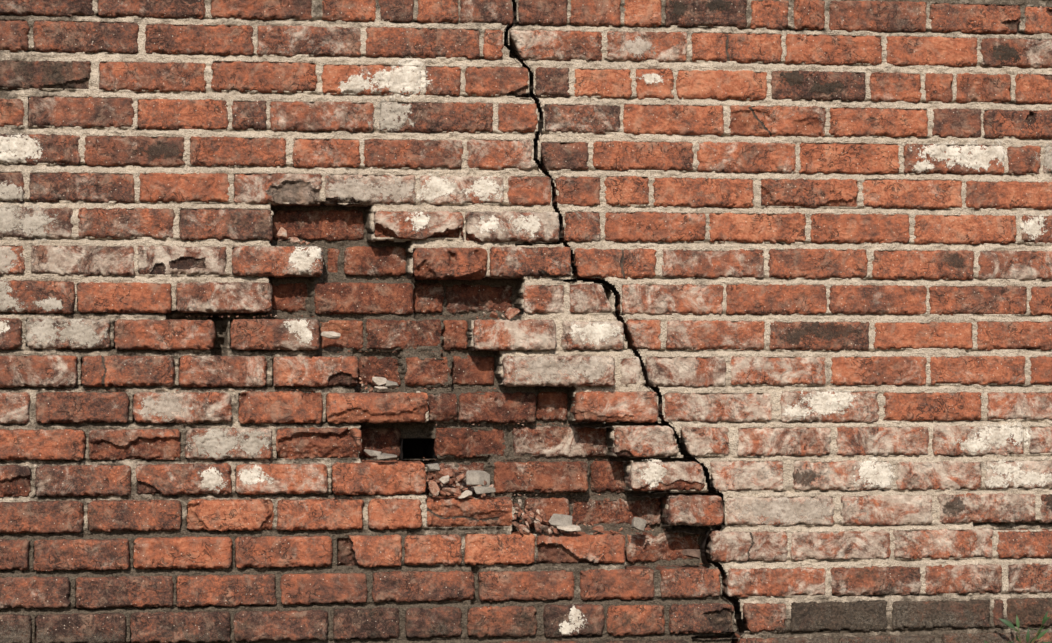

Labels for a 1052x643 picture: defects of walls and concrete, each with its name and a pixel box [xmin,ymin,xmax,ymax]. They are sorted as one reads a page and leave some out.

crack [749,107,772,137]
crack [504,0,755,642]
spalling [264,178,705,569]
spalling [239,391,249,408]
spalling [259,499,274,531]